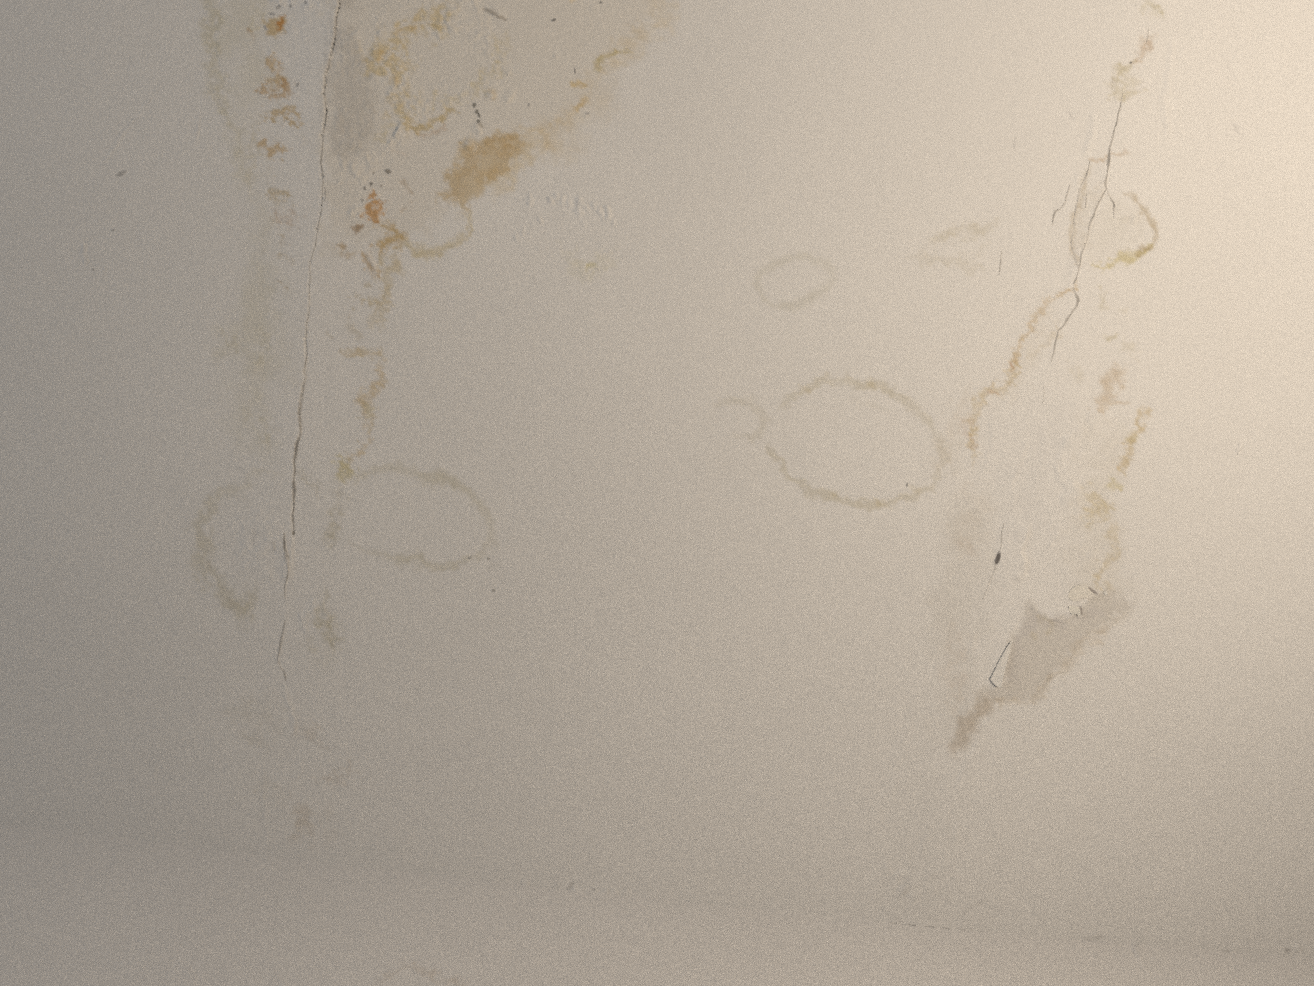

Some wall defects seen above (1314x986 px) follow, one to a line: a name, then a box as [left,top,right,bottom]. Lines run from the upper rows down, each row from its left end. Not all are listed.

crack [264,0,341,738]
damp [183,0,683,635]
damp [763,145,1163,514]
crack [1042,94,1123,403]